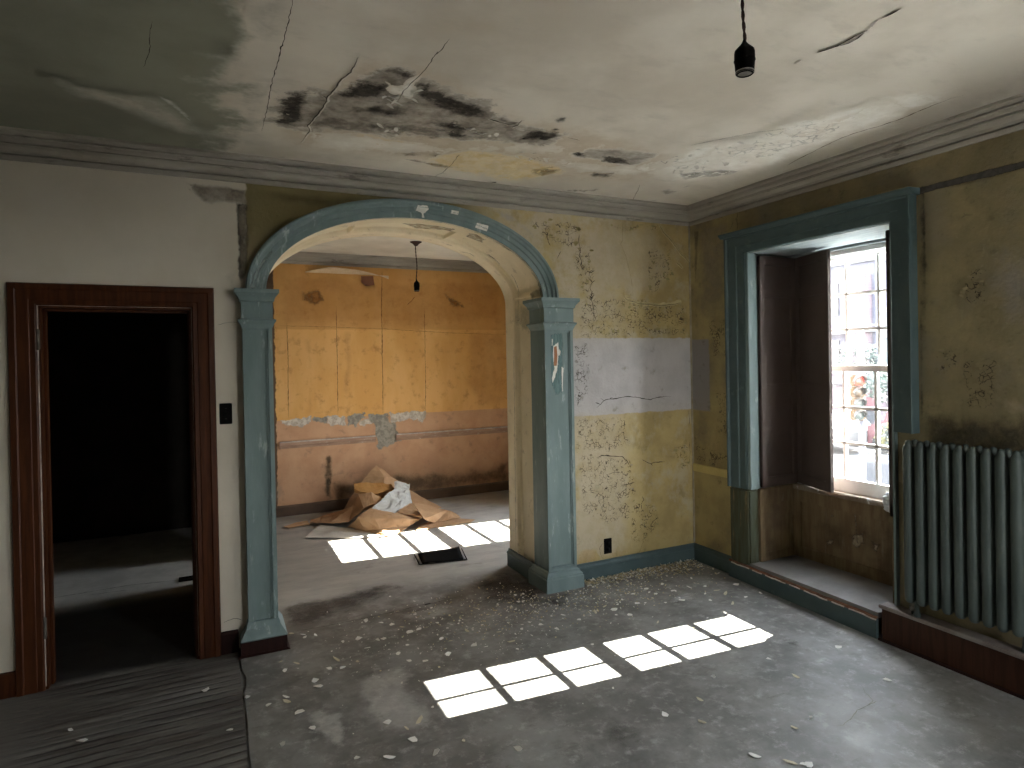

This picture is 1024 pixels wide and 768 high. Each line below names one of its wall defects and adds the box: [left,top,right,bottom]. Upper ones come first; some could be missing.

crack [263,0,293,125]
crack [302,57,361,143]
crack [399,41,448,99]
damp [258,53,970,188]
crack [793,9,902,64]